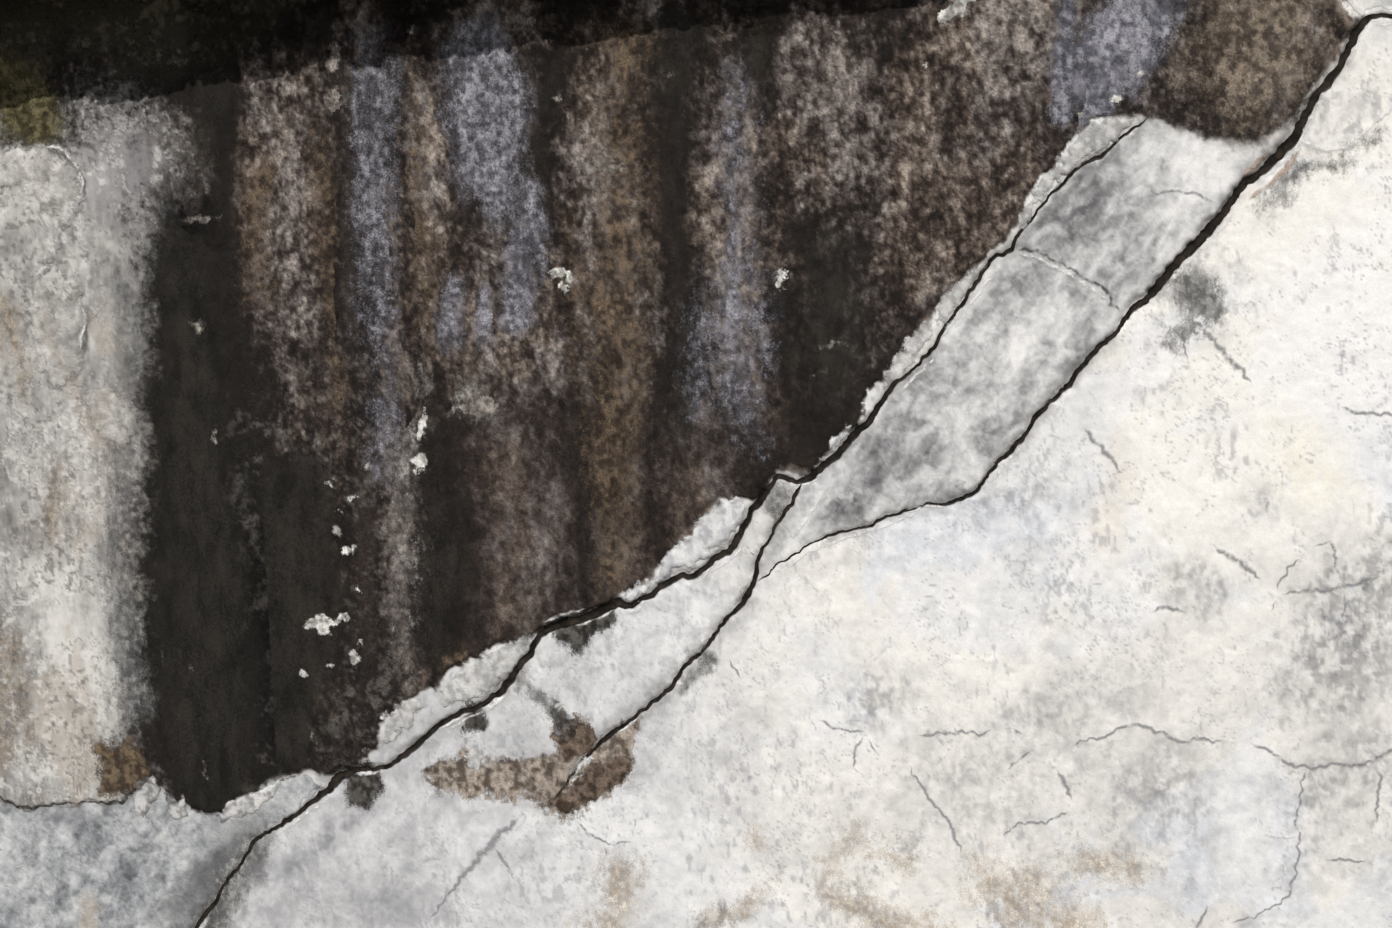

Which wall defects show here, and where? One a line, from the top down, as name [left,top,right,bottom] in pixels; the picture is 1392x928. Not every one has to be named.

water stain [1257,128,1381,212]
flaking render [883,267,979,387]
crack [759,13,1392,580]
water stain [1162,266,1227,354]
crack [195,117,1148,928]
flaking render [622,496,746,602]
water stain [552,608,616,655]
flaking render [378,635,531,743]
water stain [461,699,488,734]
flaking render [421,700,643,822]
crack [0,788,152,849]
crack [1198,746,1392,925]